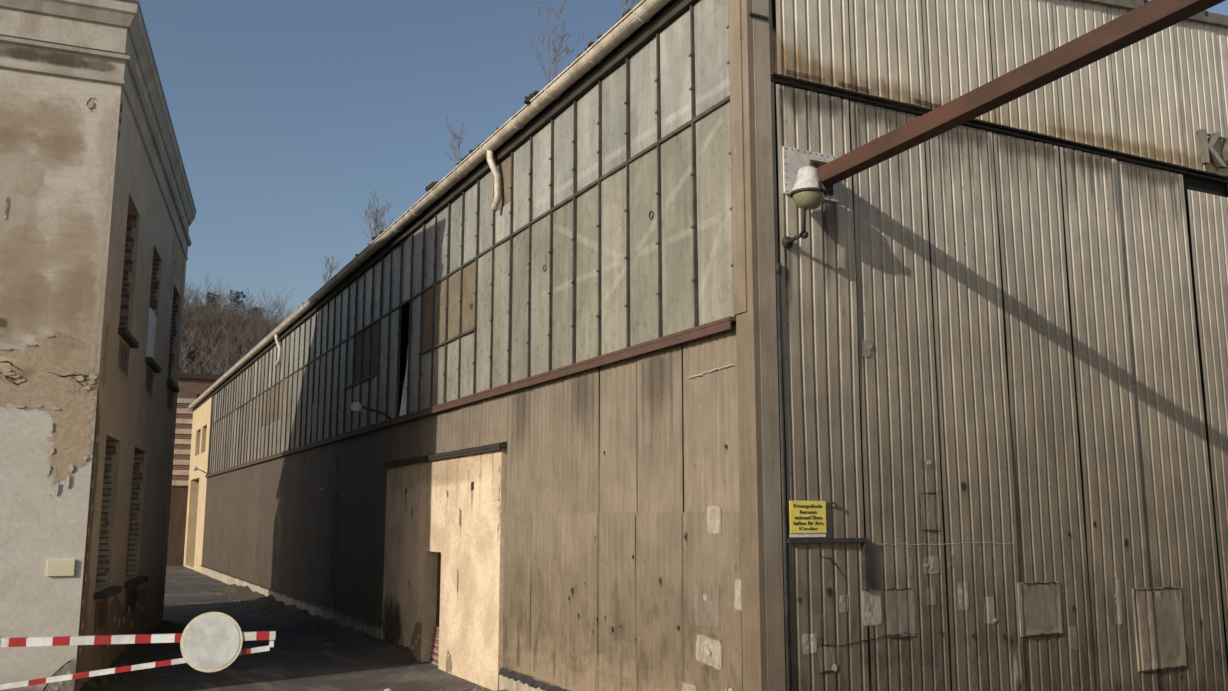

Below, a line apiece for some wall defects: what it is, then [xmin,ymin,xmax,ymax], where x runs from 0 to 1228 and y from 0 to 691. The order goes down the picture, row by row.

crack [0,361,89,386]
flaking render [0,325,109,691]
spalling [102,588,148,669]